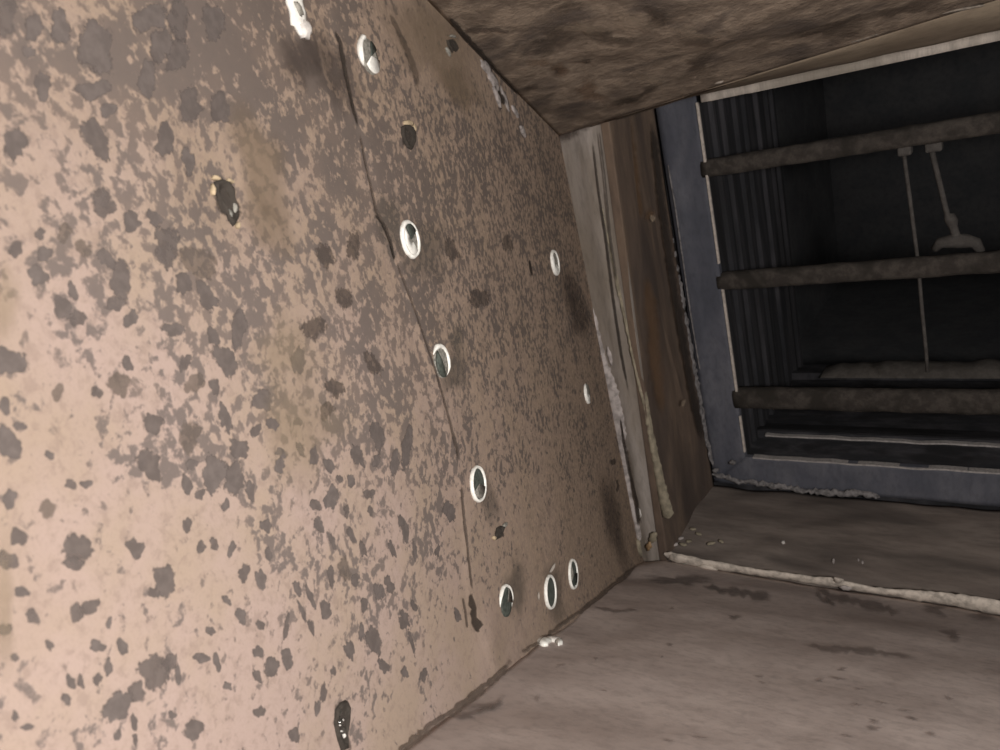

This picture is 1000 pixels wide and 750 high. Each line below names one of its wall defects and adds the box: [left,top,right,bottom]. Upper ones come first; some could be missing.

leakage [0,0,118,162]
leakage [54,223,138,328]
leakage [93,187,219,310]
crack [336,33,459,457]
leakage [0,397,27,459]
leakage [179,309,280,512]
leakage [274,422,417,589]
crack [461,488,473,587]
leakage [61,638,128,706]
leakage [100,653,182,746]
leakage [252,581,332,683]
leakage [343,574,428,682]